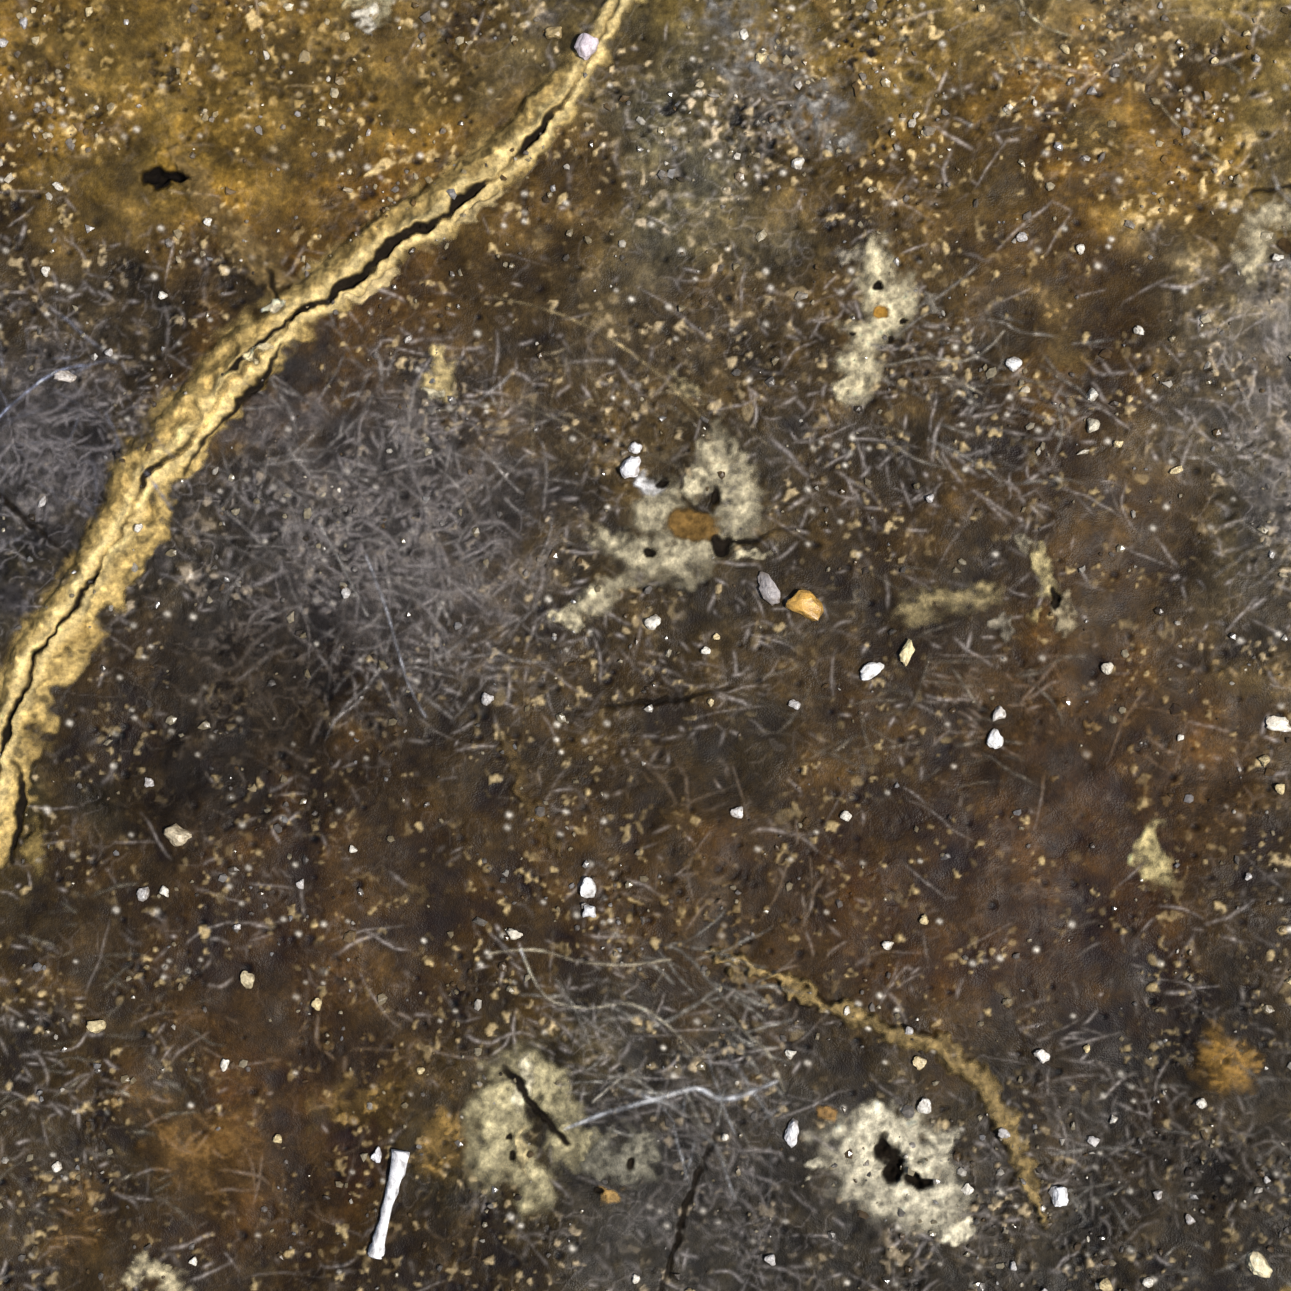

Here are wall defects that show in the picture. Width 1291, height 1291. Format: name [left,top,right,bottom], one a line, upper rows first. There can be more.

crack [1249,183,1291,195]
crack [0,0,644,875]
crack [731,533,768,544]
crack [621,692,710,705]